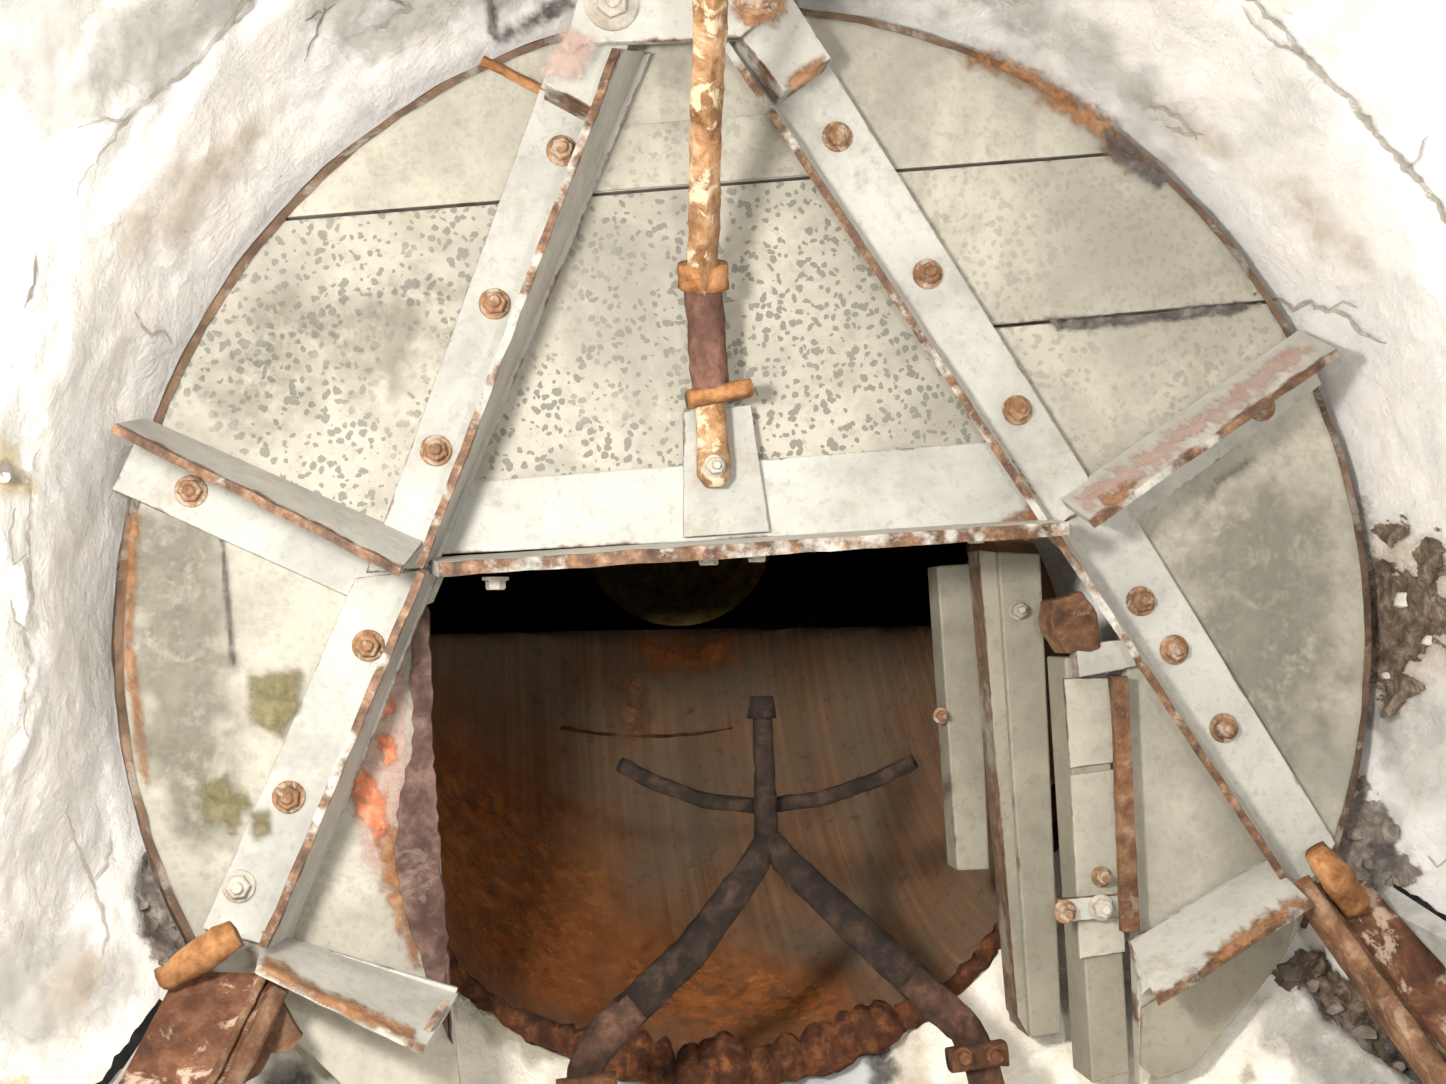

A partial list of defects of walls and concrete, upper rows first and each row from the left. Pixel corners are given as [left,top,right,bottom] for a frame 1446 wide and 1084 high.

crack [304,0,414,62]
crack [76,0,255,196]
corrosion [967,51,1150,164]
crack [1241,0,1446,224]
crack [1260,297,1387,344]
spalling [0,458,26,485]
crack [8,449,40,737]
spalling [1357,504,1446,725]
corrosion [1051,783,1059,852]
corrosion [942,921,1001,996]
corrosion [605,952,928,1084]